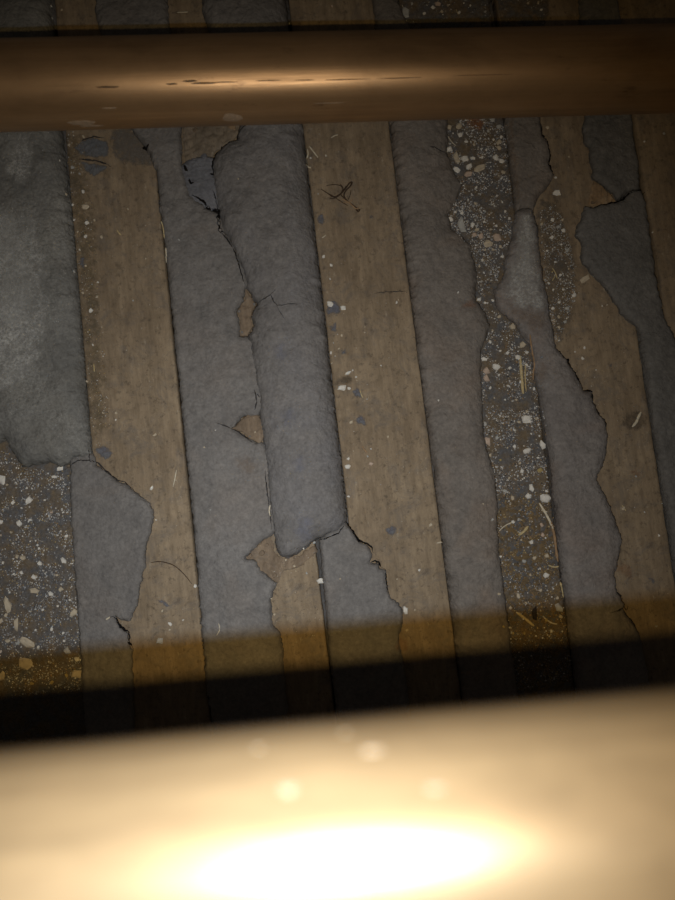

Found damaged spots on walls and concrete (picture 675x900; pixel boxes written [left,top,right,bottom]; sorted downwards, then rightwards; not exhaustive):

spalling [453,151,486,177]
crack [183,125,246,281]
spalling [525,484,551,503]
spalling [18,658,33,670]